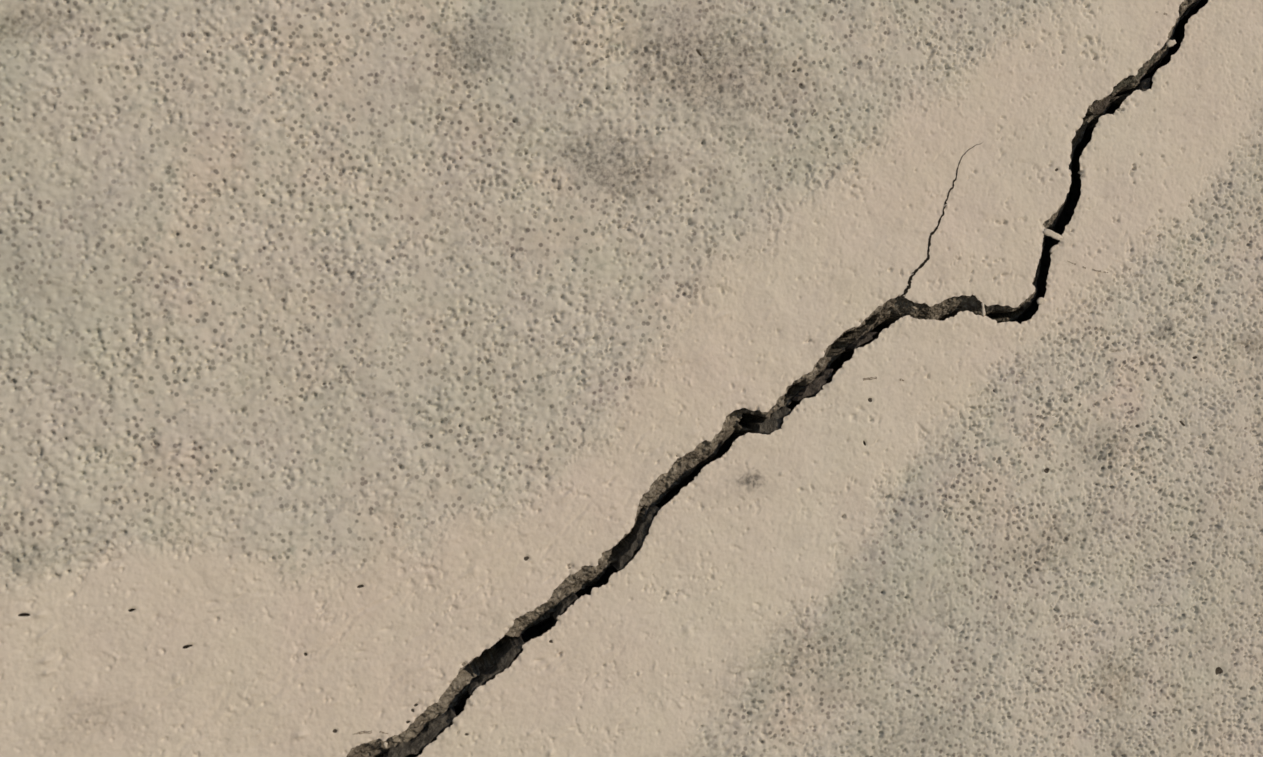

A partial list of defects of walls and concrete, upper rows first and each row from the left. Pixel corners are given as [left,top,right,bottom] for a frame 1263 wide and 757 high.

crack [347,0,1202,757]